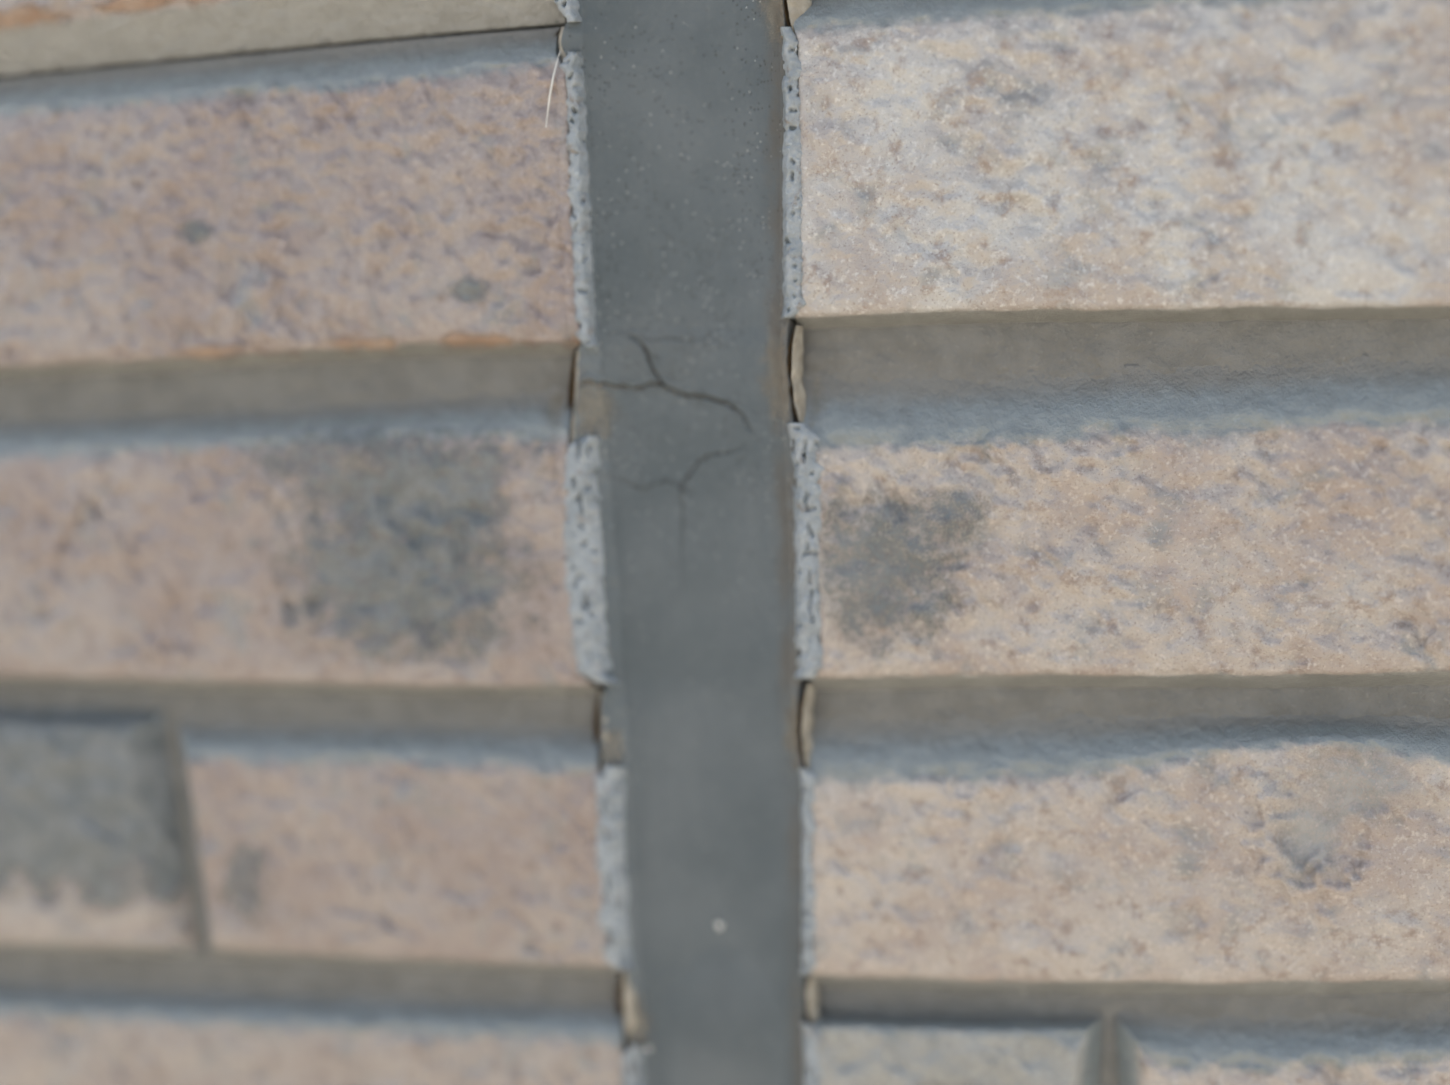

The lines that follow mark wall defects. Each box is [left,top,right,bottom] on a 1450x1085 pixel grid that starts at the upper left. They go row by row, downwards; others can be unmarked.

peeling [782,0,812,34]
peeling [566,350,580,444]
crack [577,336,750,430]
peeling [787,325,806,423]
peeling [593,691,610,770]